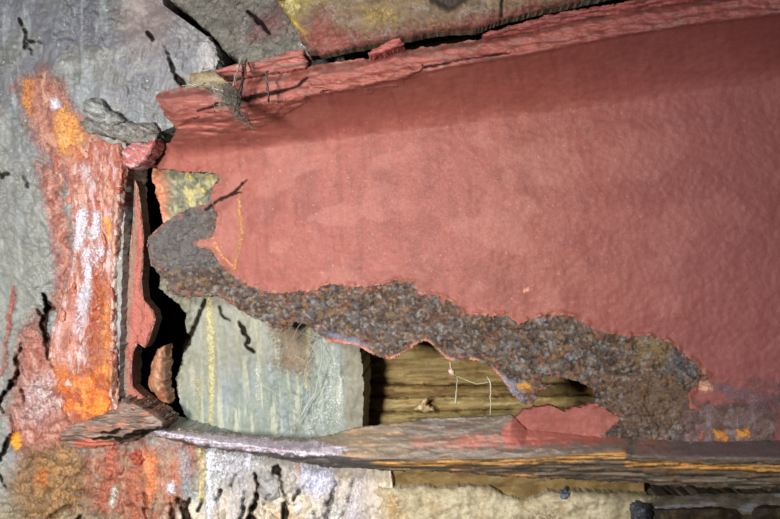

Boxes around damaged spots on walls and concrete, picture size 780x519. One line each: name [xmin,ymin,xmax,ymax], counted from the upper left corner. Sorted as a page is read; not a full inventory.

corrosion [9,63,101,313]
crack [0,343,23,488]
crack [37,293,55,357]
corrosion [0,247,207,519]
corrosion [147,172,780,442]
crack [168,472,301,519]
crack [312,479,354,519]